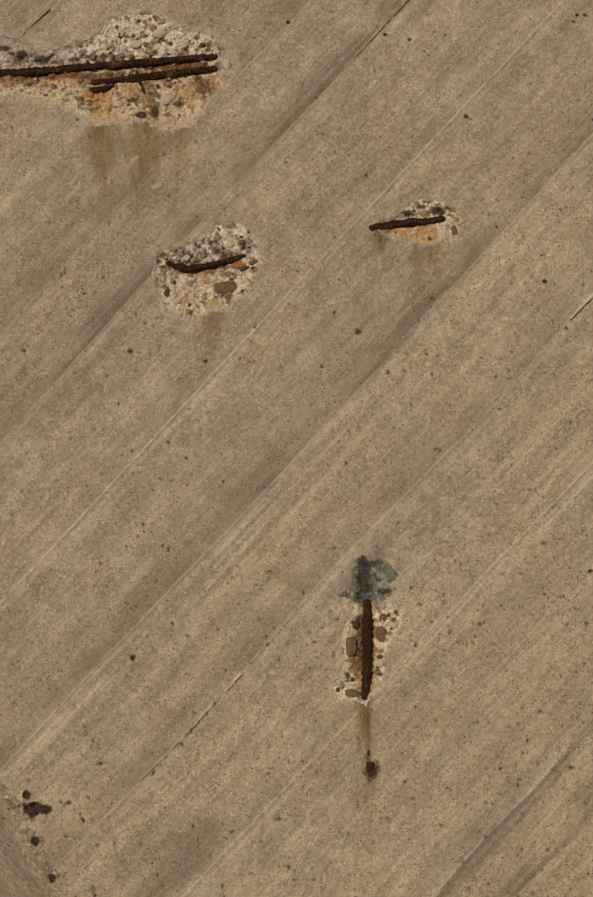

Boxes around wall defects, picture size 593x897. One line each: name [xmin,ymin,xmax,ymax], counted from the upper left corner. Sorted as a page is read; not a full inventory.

spalling [0,9,239,133]
spalling [151,221,262,321]
spalling [369,198,463,247]
spalling [333,555,402,706]
crack [141,675,242,781]
rust [365,749,379,777]
spalling [2,784,65,897]